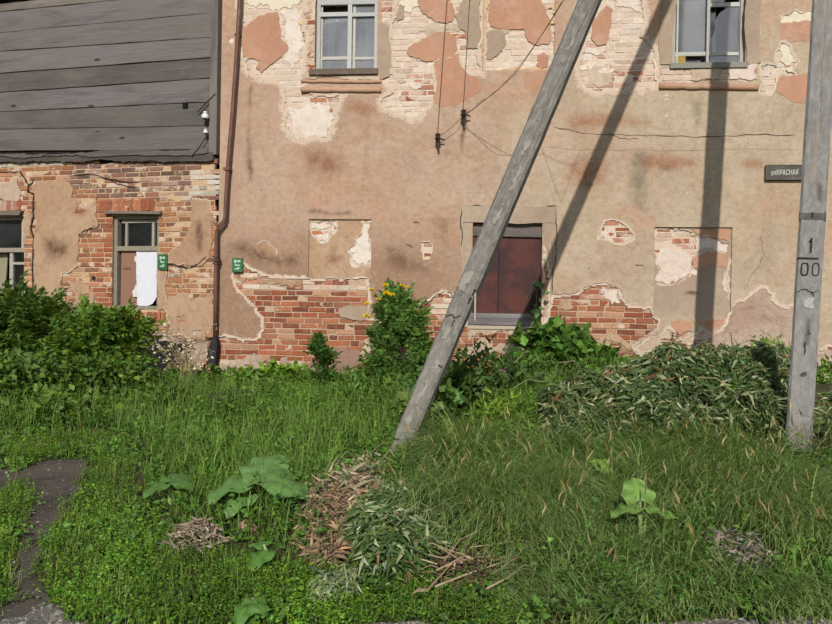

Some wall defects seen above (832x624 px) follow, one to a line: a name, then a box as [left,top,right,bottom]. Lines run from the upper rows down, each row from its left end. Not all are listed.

flaking render [228,0,801,146]
crack [527,0,796,155]
flaking render [780,9,811,23]
crack [0,170,34,287]
flaking render [140,219,413,381]
flaking render [416,270,533,374]
flaking render [596,218,636,246]
flaking render [542,227,815,358]